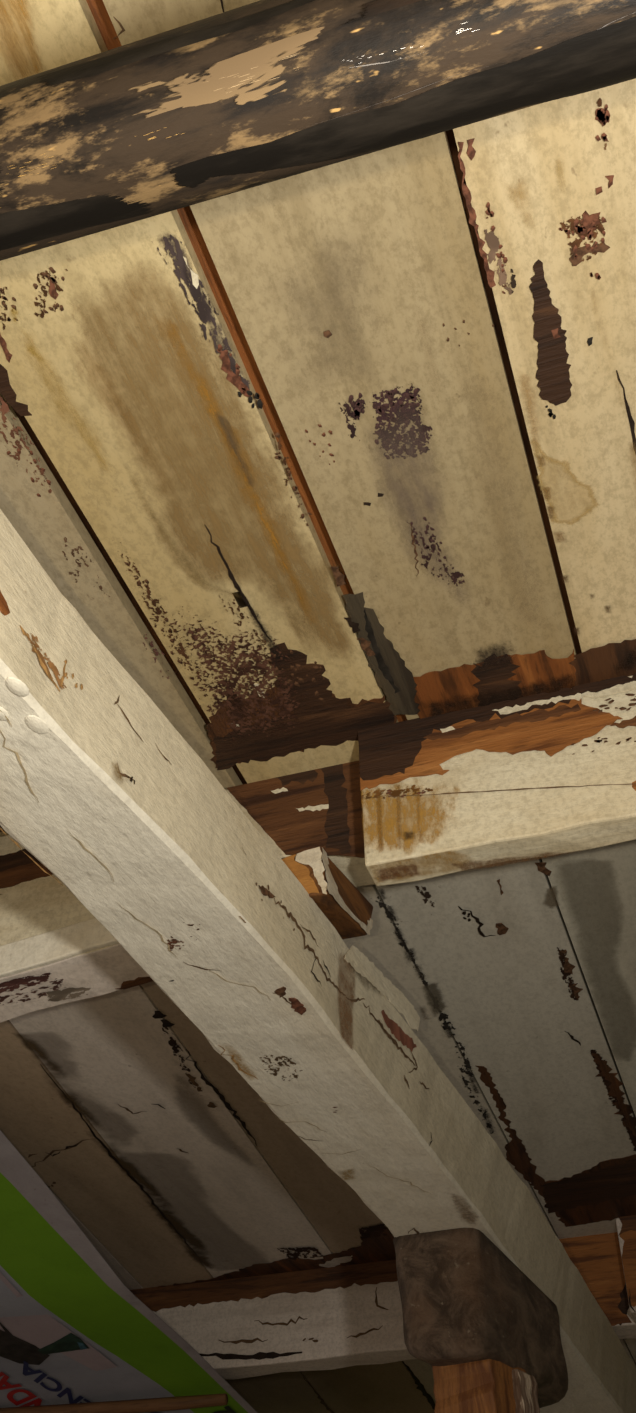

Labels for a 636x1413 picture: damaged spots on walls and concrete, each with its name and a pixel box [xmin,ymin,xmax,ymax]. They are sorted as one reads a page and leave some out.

peeling [37,0,315,87]
peeling [129,27,324,140]
peeling [0,194,155,251]
peeling [169,17,636,419]
peeling [0,267,68,363]
damp [86,235,348,651]
peeling [305,383,433,465]
peeling [121,554,636,937]
peeling [274,986,306,1015]
peeling [344,945,429,1089]
peeling [557,947,583,1001]
peeling [476,1031,636,1326]